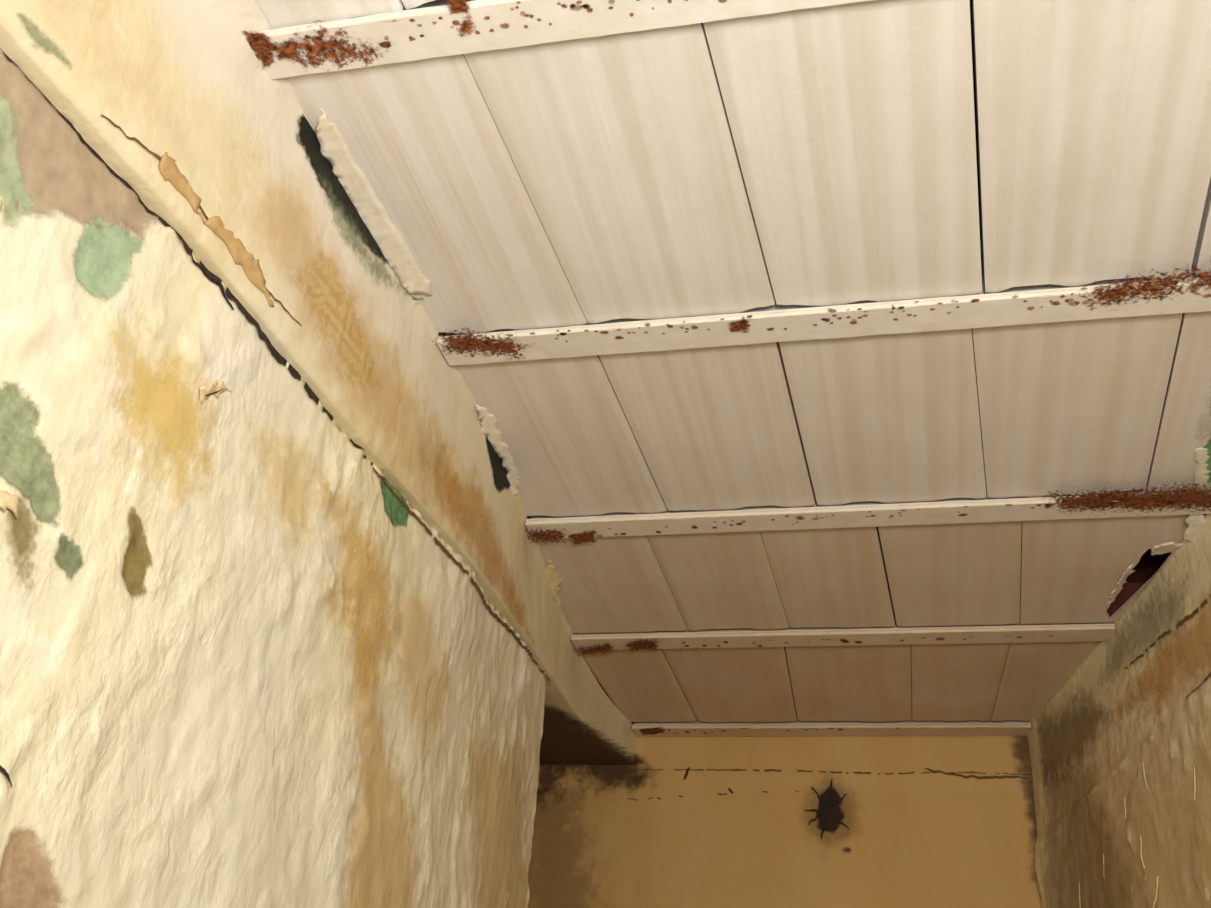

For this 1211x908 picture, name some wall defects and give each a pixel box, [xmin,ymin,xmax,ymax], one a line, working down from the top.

corrosion [243,20,391,69]
corrosion [439,0,509,37]
flaking render [297,109,431,300]
corrosion [1050,266,1211,310]
damp [134,365,199,468]
peeling [0,384,83,578]
corrosion [1031,482,1211,513]
peeling [122,508,152,596]
spalling [1106,514,1206,617]
crack [0,765,12,787]
mould [537,706,647,801]
damp [804,778,849,840]